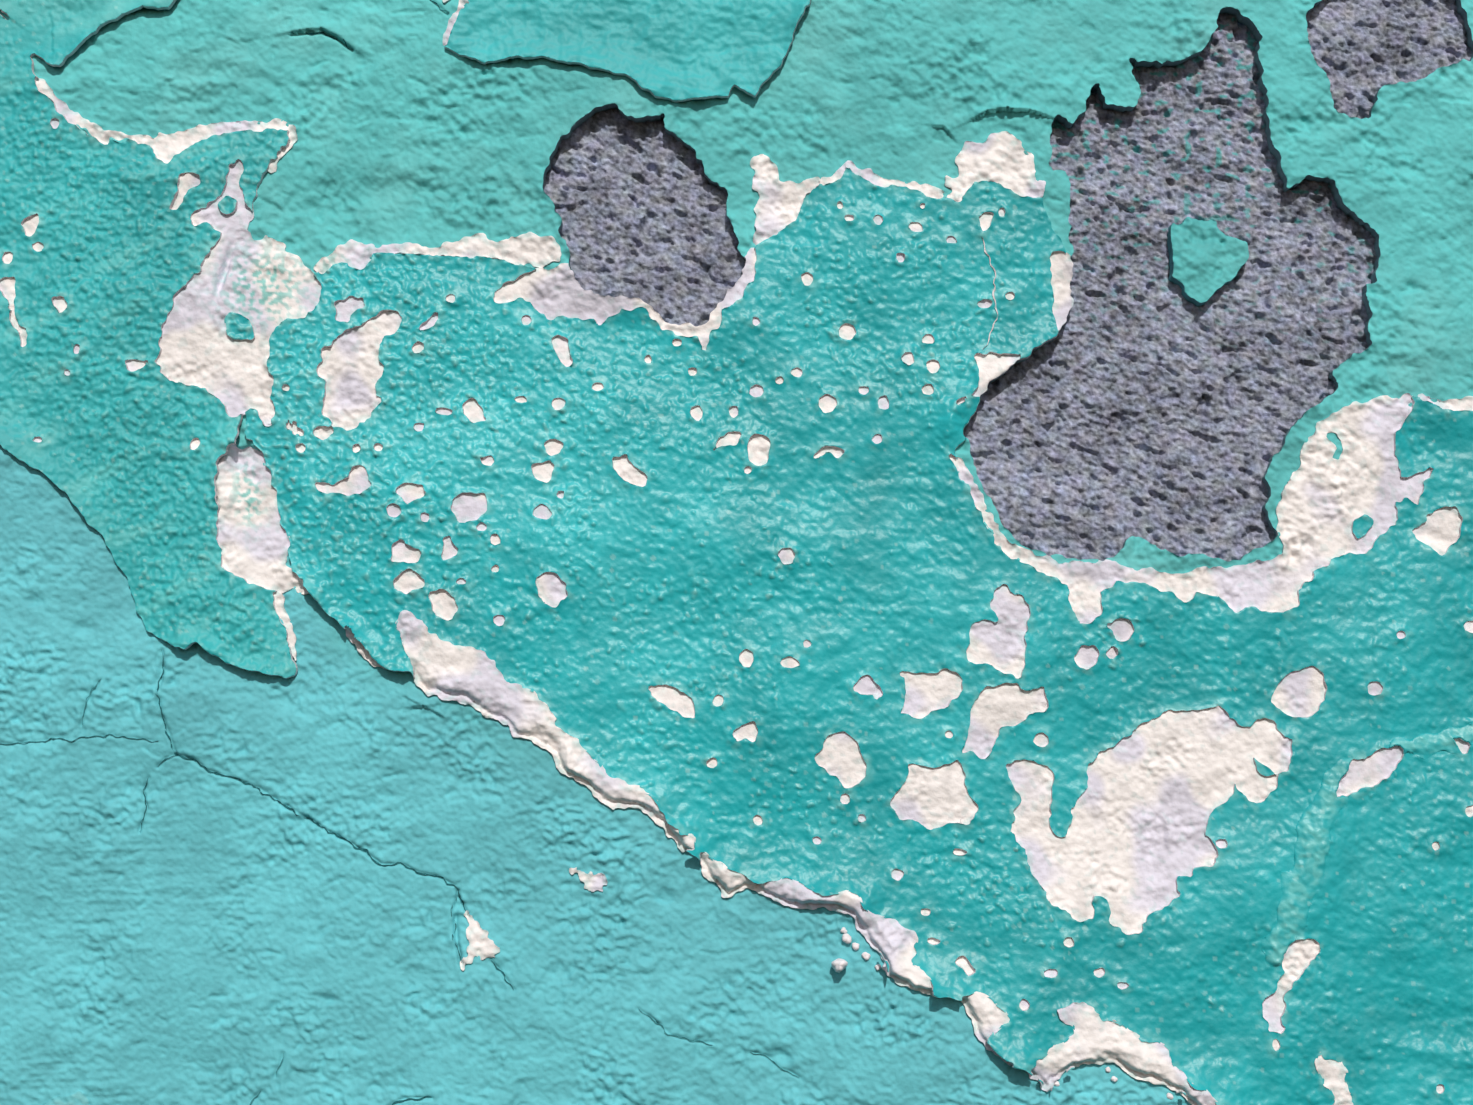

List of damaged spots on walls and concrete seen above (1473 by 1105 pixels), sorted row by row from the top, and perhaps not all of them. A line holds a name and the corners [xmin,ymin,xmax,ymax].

peeling [0,0,322,679]
spalling [494,108,756,350]
peeling [944,131,1046,202]
spalling [963,13,1377,562]
spalling [1306,0,1472,119]
peeling [244,154,1473,1105]
crack [0,649,514,990]